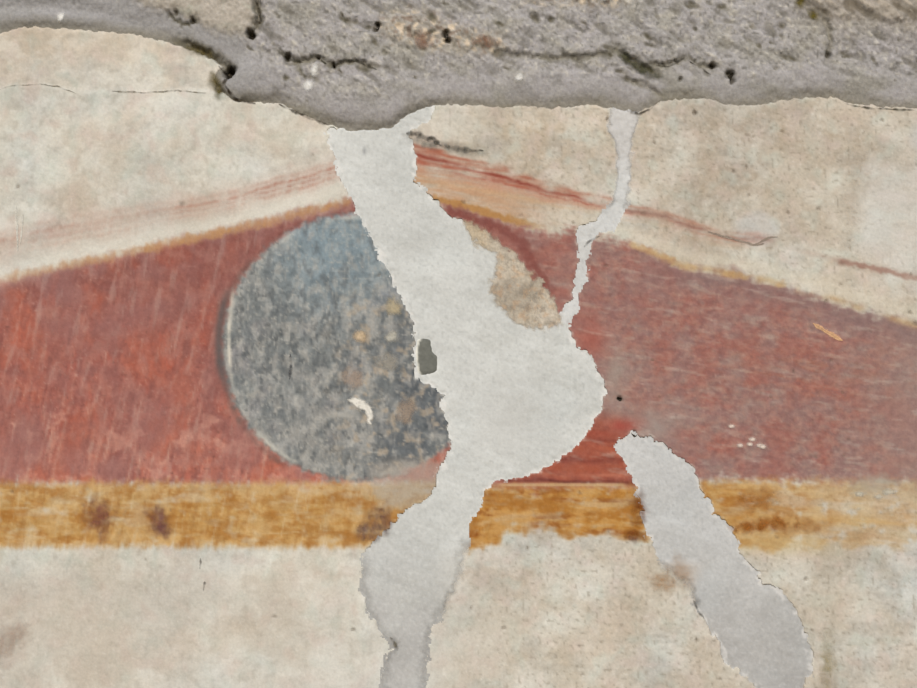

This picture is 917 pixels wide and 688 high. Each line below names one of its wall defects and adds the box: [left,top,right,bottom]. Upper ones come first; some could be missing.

flaking render [324,105,607,688]
flaking render [614,430,814,688]